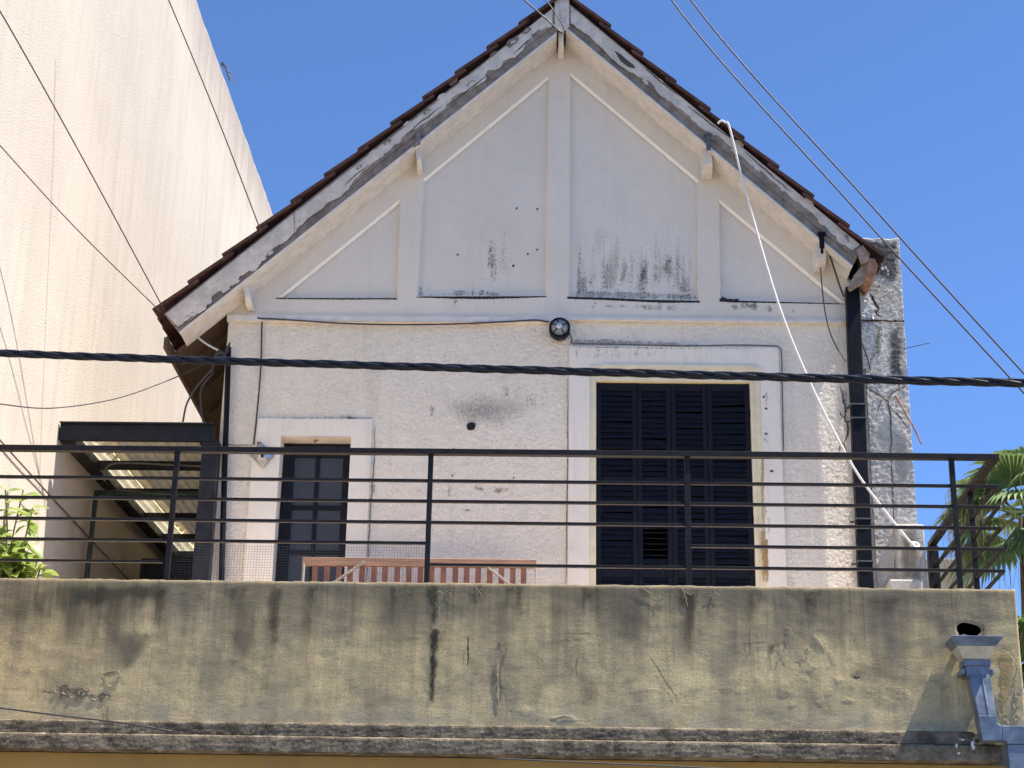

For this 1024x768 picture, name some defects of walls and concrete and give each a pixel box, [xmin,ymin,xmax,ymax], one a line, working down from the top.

peeling [571,7,860,250]
peeling [166,9,553,326]
damp [567,254,700,310]
crack [861,316,904,324]
damp [60,587,164,610]
damp [272,590,280,627]
damp [112,636,145,665]
damp [428,586,438,701]
flaking render [43,670,123,701]